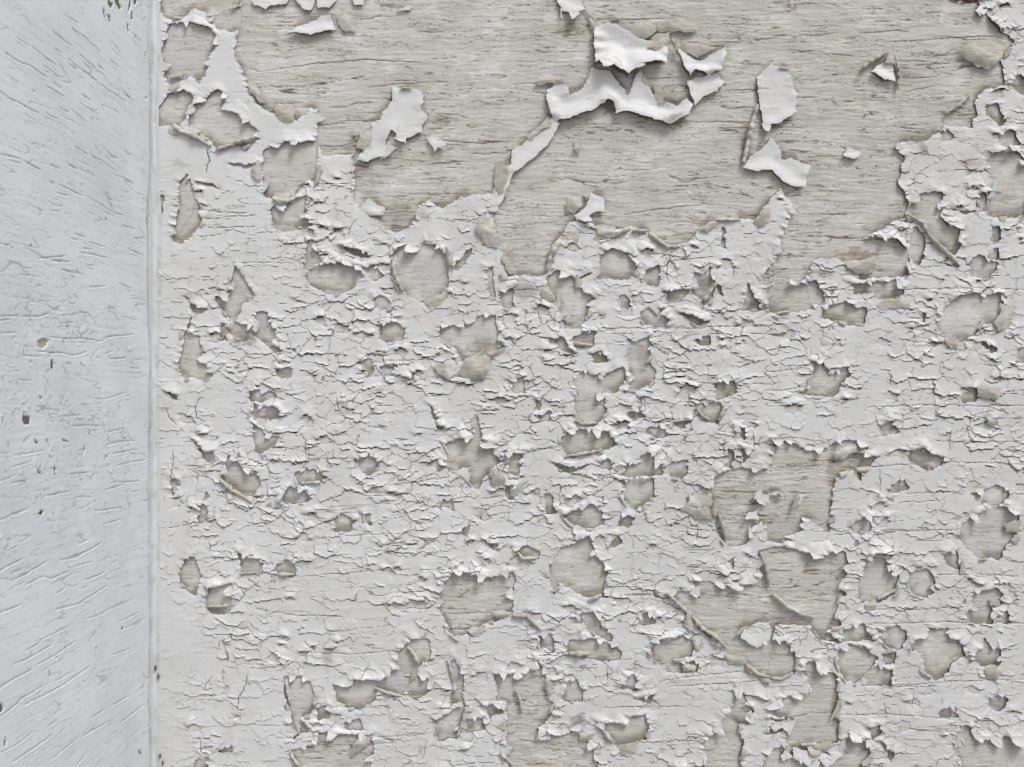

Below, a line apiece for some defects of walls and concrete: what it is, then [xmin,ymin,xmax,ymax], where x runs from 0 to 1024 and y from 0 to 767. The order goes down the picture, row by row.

crack [201,210,316,264]
crack [624,205,701,215]
peeling [159,0,1024,548]
crack [605,395,675,428]
crack [873,431,1023,490]
crack [833,491,965,536]
peeling [282,492,656,767]
peeling [647,424,1024,767]
crack [864,604,1024,625]
crack [605,669,764,711]
crack [785,679,1018,736]